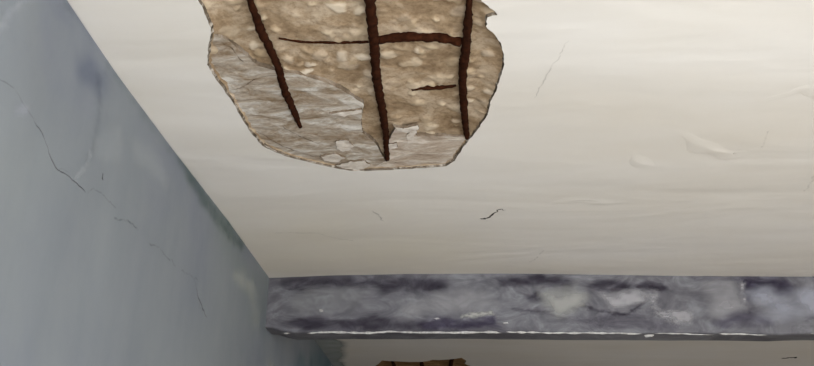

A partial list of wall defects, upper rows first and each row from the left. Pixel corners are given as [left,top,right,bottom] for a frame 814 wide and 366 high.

spalling [198,0,504,171]
crack [34,121,85,191]
spalling [376,358,469,366]